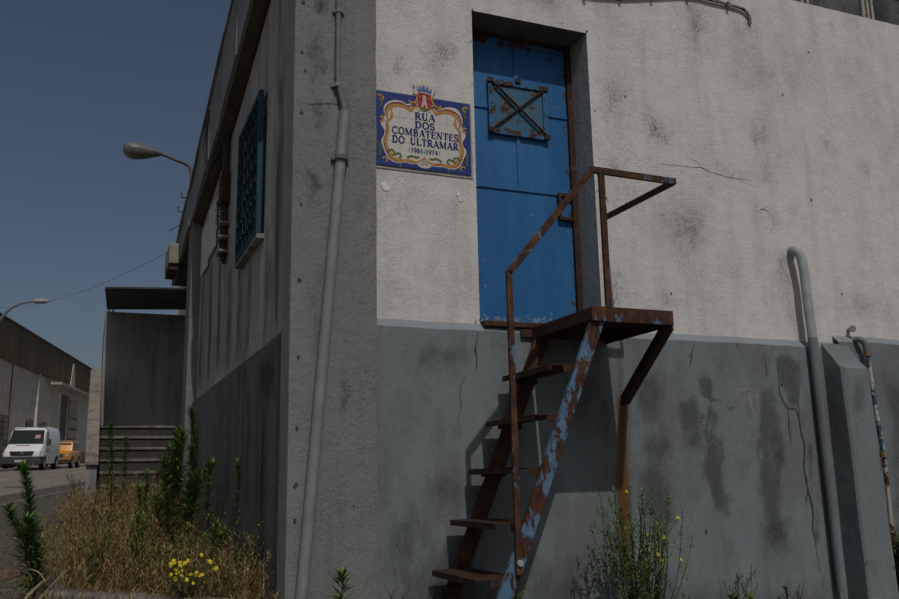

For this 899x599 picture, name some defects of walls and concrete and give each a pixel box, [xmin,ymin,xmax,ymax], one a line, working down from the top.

corrosion [619,401,629,577]
crack [764,351,820,567]